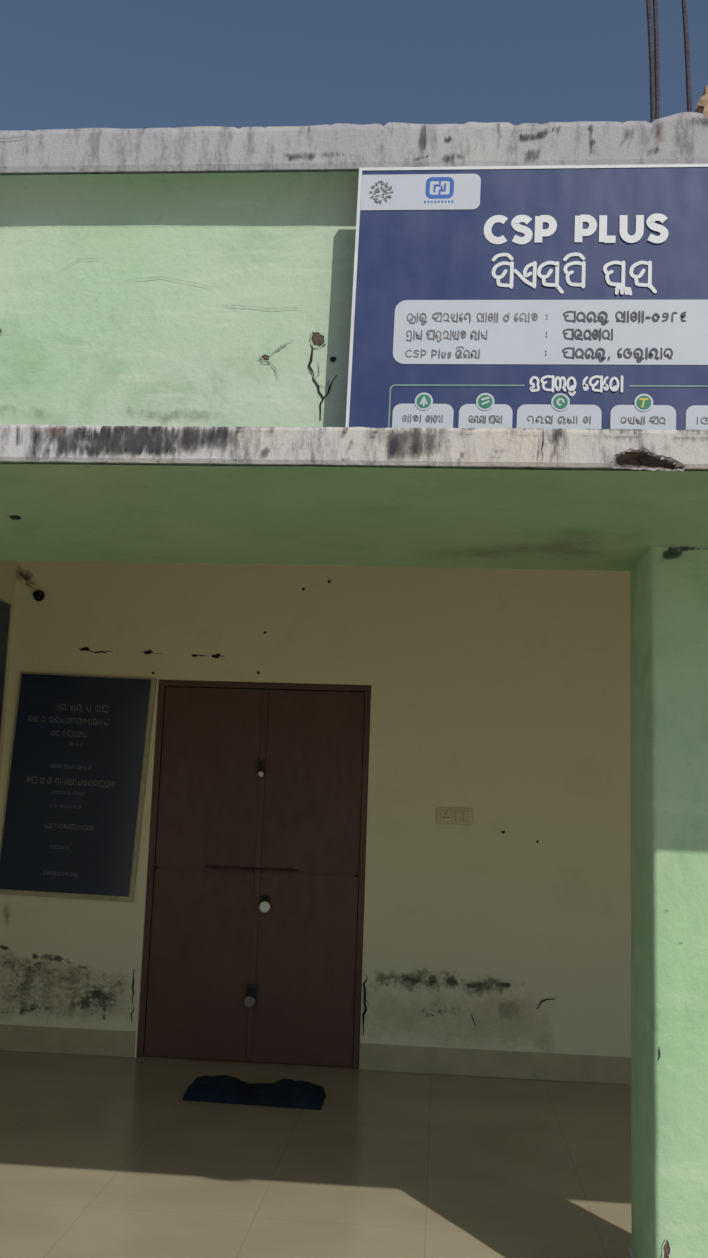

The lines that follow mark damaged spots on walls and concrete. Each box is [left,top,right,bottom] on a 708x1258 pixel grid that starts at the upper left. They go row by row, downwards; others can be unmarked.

water stain [520,127,560,160]
crack [308,346,337,421]
water stain [33,426,239,456]
water stain [373,428,436,457]
spalling [612,447,685,472]
mould [377,970,510,992]
spalling [662,1238,673,1258]